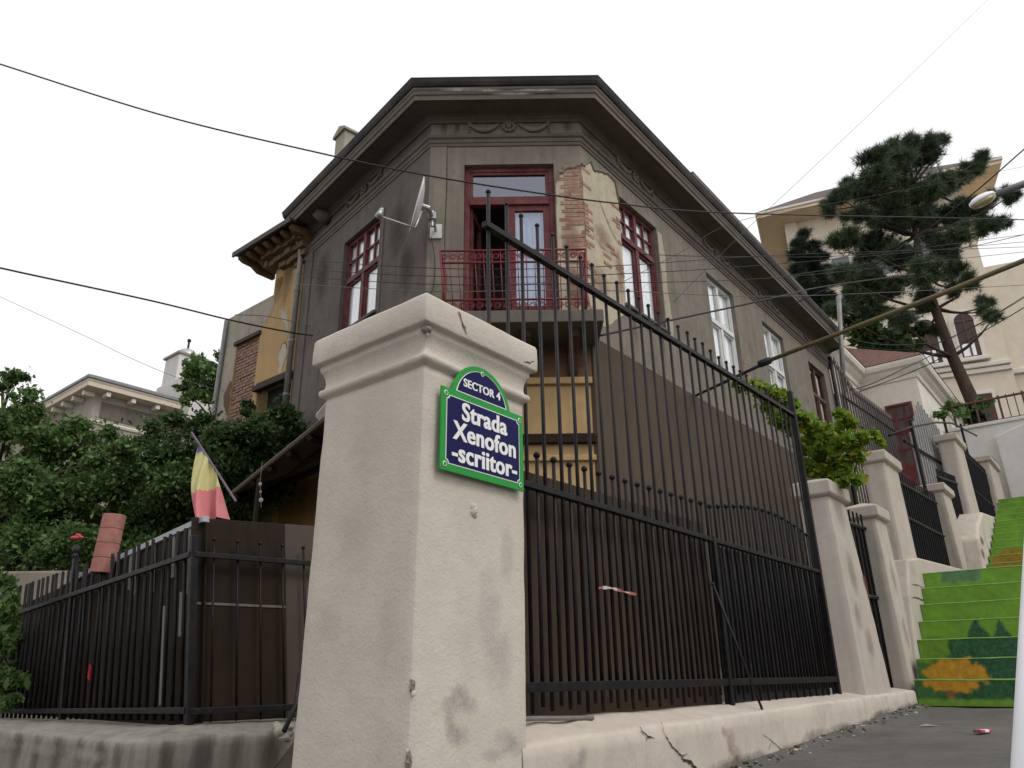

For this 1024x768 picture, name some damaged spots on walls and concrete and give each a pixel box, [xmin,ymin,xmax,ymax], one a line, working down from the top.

peeling [555,159,626,327]
crack [640,723,697,768]